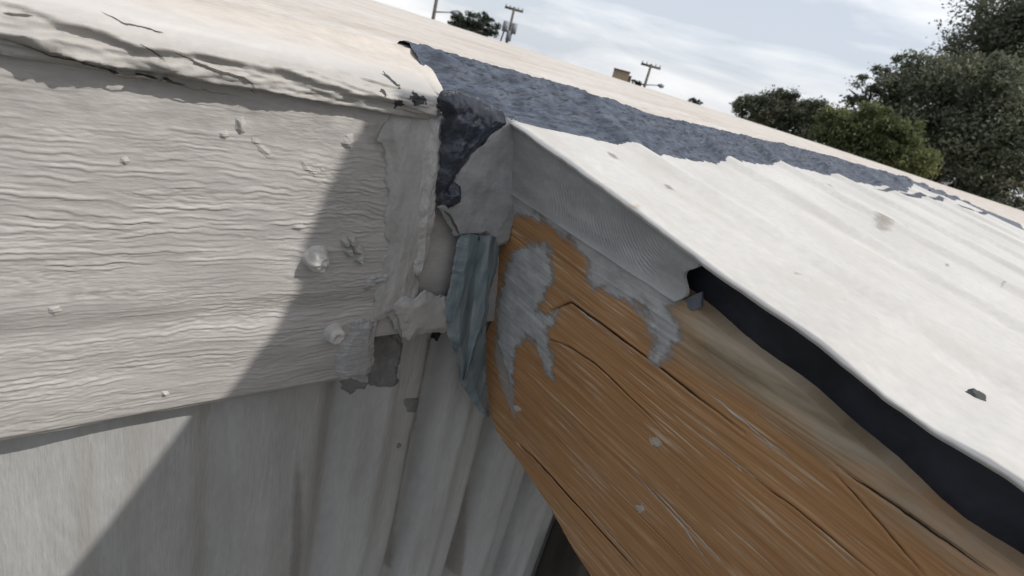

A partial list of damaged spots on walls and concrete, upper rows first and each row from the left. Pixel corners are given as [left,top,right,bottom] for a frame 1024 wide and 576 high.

crack [3,10,32,18]
crack [11,12,256,98]
peeling [380,70,427,109]
peeling [412,116,443,276]
peeling [393,289,448,341]
crack [552,302,737,427]
crack [520,445,641,576]